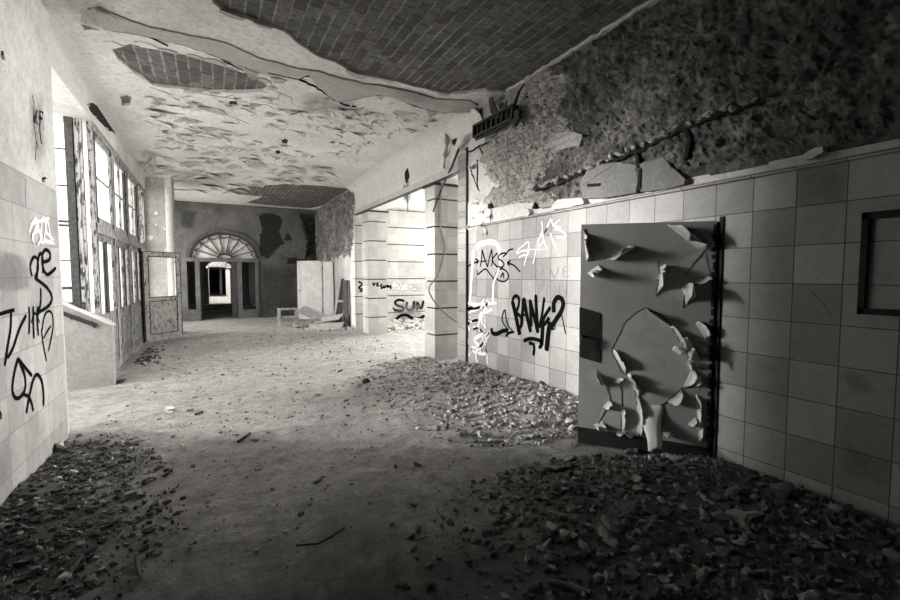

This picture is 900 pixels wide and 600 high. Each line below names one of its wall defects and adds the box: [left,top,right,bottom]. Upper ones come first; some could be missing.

crack [104,29,470,124]
flaking render [81,0,900,265]
peeling [583,230,635,277]
peeling [594,224,717,460]